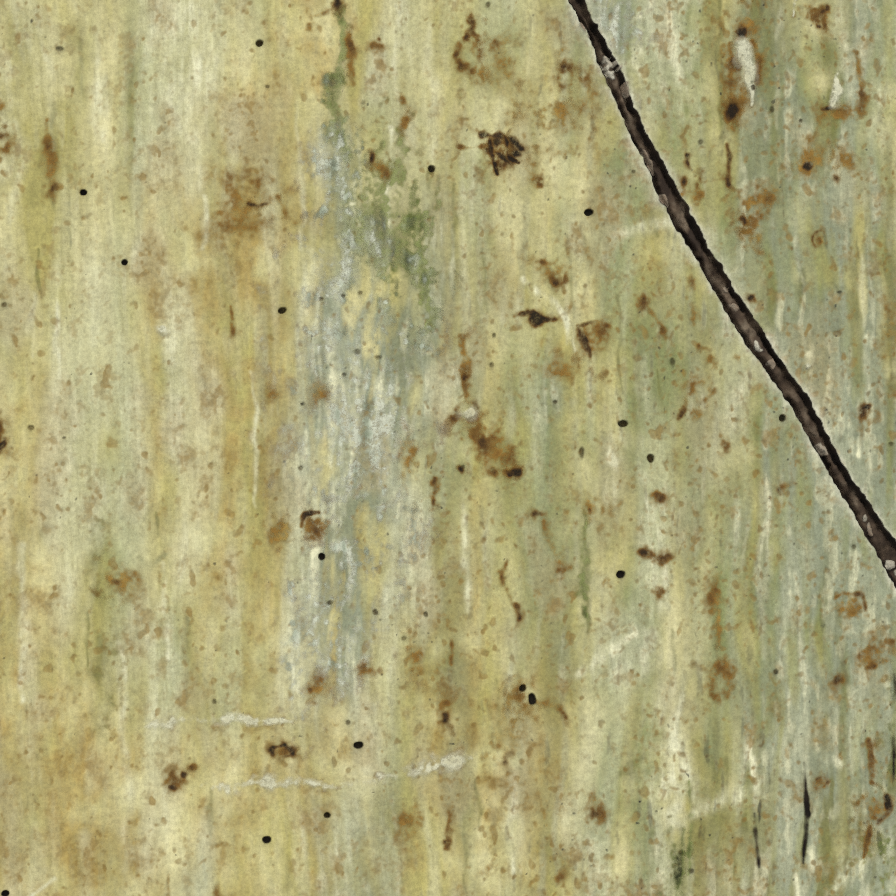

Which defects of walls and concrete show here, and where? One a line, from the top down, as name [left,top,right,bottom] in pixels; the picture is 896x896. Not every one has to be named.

leakage [312,7,352,214]
corrosion [478,131,525,176]
corrosion [538,102,568,125]
corrosion [721,17,763,131]
leakage [307,230,355,306]
leakage [401,193,440,349]
corrosion [513,310,558,328]
corrosion [577,320,611,358]
crack [569,0,896,587]
leakage [313,366,409,519]
corrosion [450,334,523,478]
leakage [288,540,372,647]